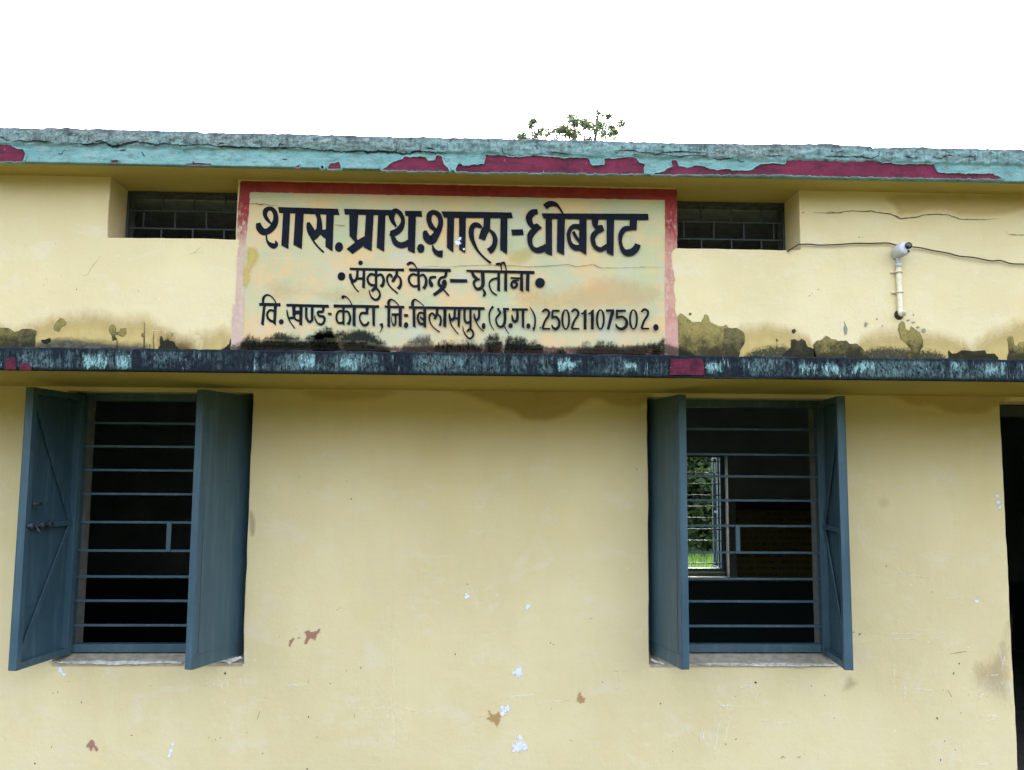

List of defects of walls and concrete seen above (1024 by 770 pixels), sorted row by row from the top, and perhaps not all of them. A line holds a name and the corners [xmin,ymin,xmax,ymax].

peeling [0,143,27,164]
peeling [320,161,342,171]
peeling [380,154,1004,181]
crack [813,210,1015,235]
water stain [34,318,693,356]
water stain [739,329,811,357]
water stain [860,325,1024,360]
peeling [289,629,320,646]
peeling [487,711,501,725]